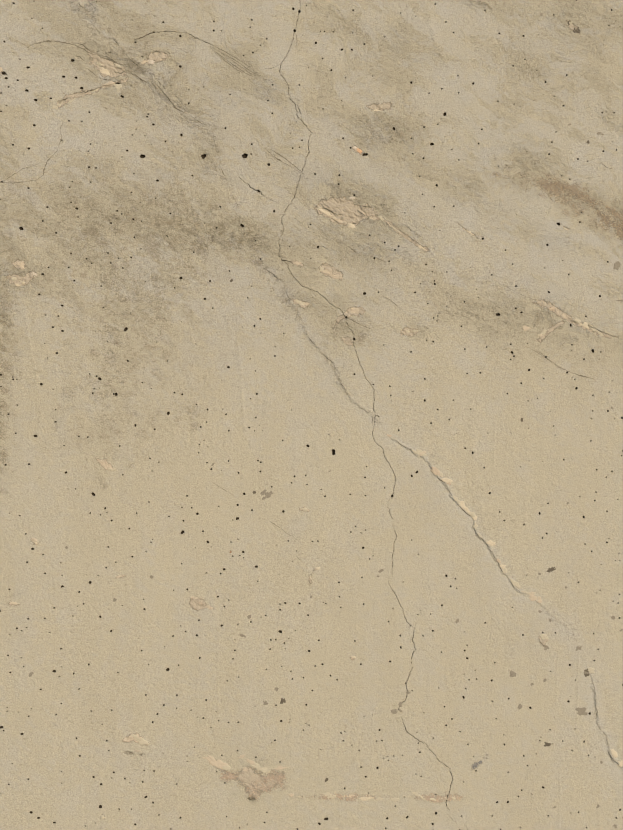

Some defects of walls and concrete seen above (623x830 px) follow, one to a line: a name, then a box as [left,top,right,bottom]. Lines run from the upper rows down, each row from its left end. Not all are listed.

crack [0,114,68,184]
crack [172,9,366,333]
peeling [314,196,429,252]